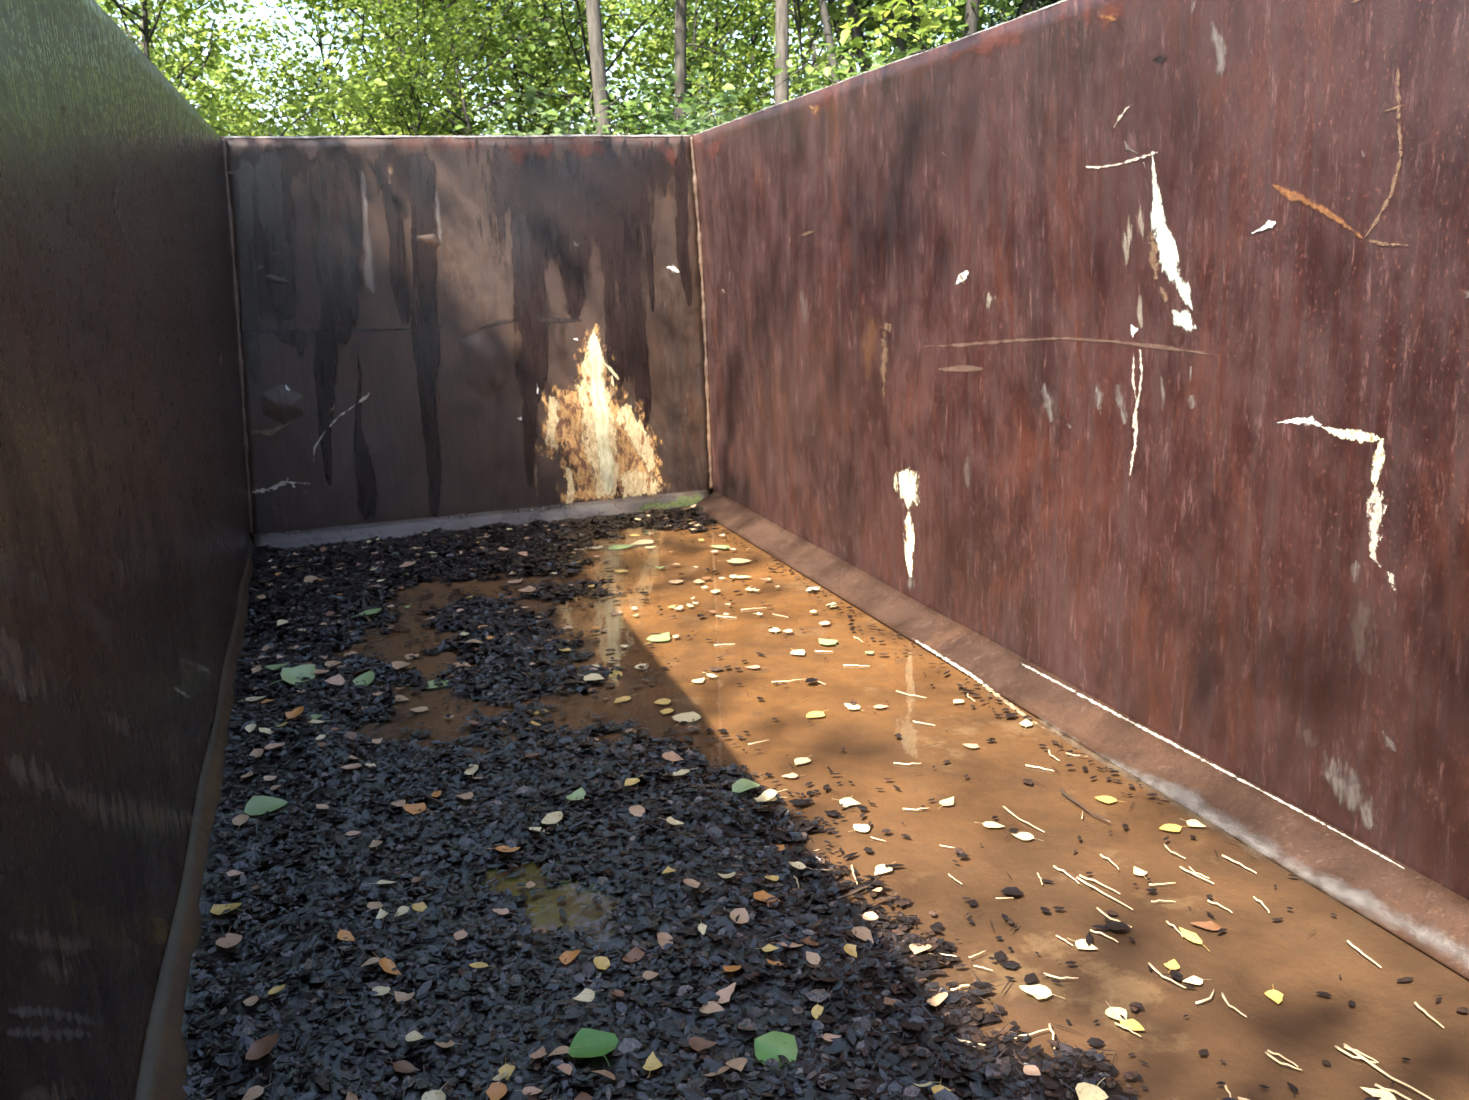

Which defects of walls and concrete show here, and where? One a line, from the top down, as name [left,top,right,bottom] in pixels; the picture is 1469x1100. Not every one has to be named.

damp [236,145,442,520]
damp [467,131,692,486]
peeling [517,323,665,504]
peeling [1124,156,1196,337]
peeling [1277,416,1396,590]